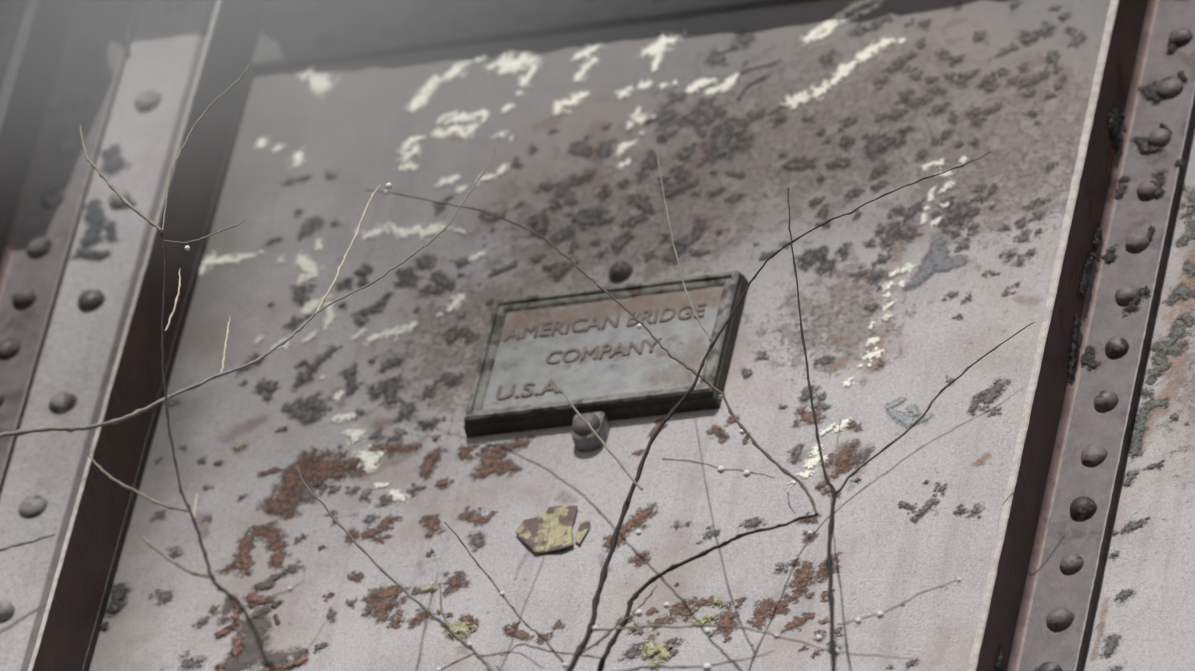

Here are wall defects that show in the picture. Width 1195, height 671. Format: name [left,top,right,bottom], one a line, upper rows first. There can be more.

peeling [551,41,605,115]
peeling [611,29,740,170]
peeling [780,35,907,109]
peeling [842,156,968,388]
peeling [328,388,411,503]
rust [215,436,535,577]
rust [603,503,657,567]
rust [793,404,826,428]
rust [799,512,821,544]
rust [815,420,863,499]
peeling [1123,261,1195,487]
rust [617,552,842,658]